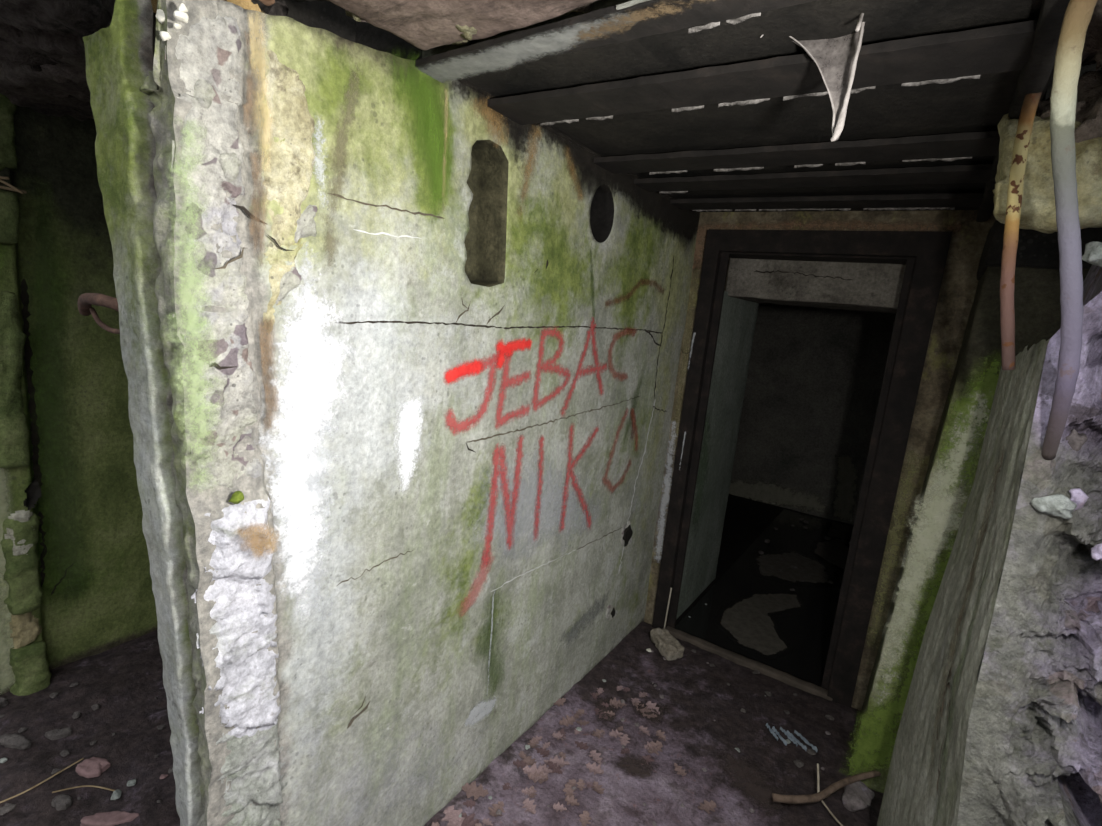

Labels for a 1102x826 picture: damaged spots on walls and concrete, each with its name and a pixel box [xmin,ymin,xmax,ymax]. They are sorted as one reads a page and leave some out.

spalling [165,13,262,490]
rust [243,14,270,250]
spalling [262,50,317,331]
crack [328,193,445,239]
damp [400,13,632,203]
damp [718,98,770,107]
damp [901,75,980,86]
rust [260,319,278,426]
crack [335,258,690,592]
spalling [191,497,288,826]
crack [347,697,370,729]
damp [878,394,988,704]